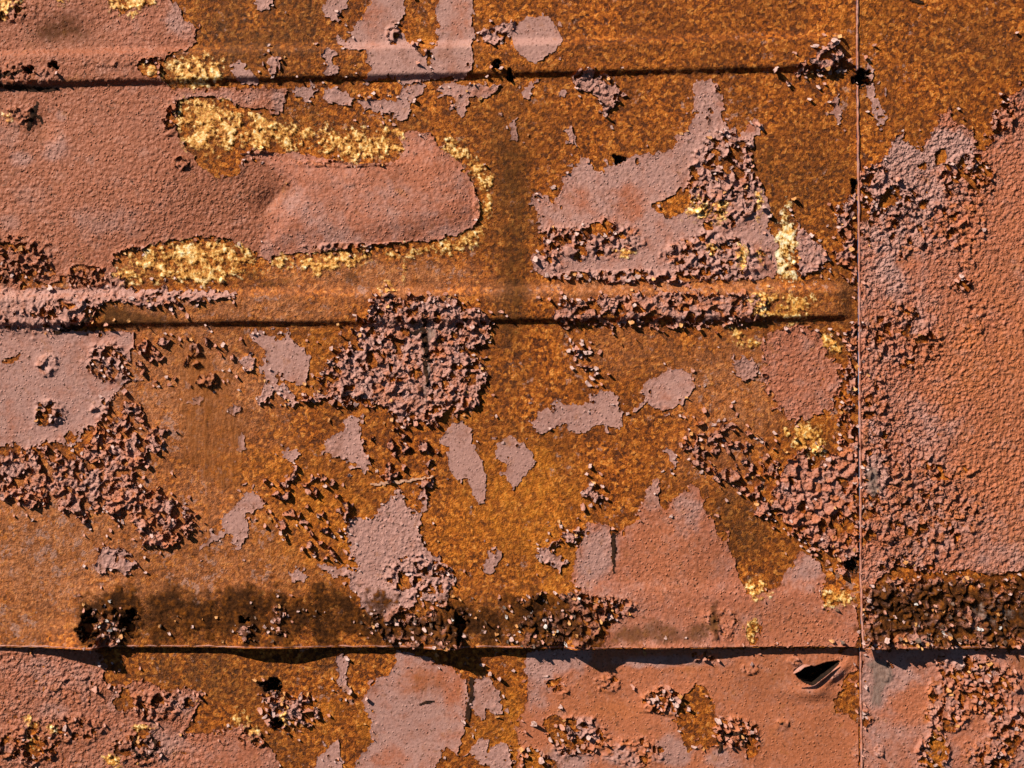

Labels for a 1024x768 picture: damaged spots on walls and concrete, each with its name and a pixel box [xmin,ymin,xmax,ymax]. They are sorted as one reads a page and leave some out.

corrosion [109,0,156,18]
corrosion [143,50,405,162]
peeling [786,33,888,131]
corrosion [112,239,370,286]
peeling [0,0,563,558]
corrosion [377,136,493,294]
corrosion [735,201,817,325]
corrosion [821,333,841,353]
peeling [314,67,1024,768]
corrosion [783,422,826,459]
corrosion [77,578,604,652]
corrosion [855,571,1024,648]